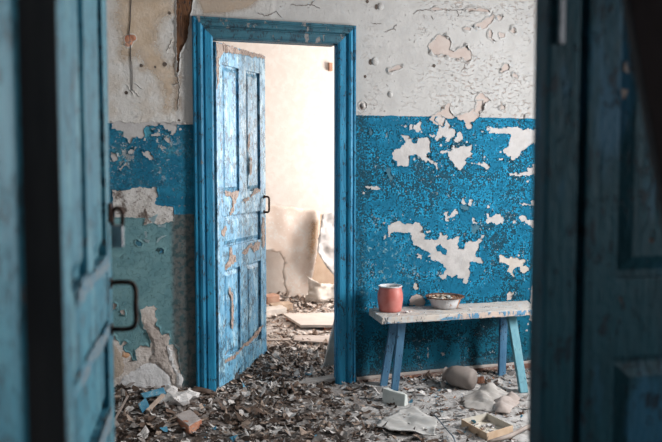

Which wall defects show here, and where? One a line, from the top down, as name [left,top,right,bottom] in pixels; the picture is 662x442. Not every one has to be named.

peeling [427,32,472,67]
peeling [462,5,517,44]
peeling [498,63,519,80]
peeling [109,115,191,172]
peeling [384,91,534,182]
peeling [363,183,382,194]
peeling [110,185,176,255]
peeling [381,196,532,285]
spalling [113,304,185,388]